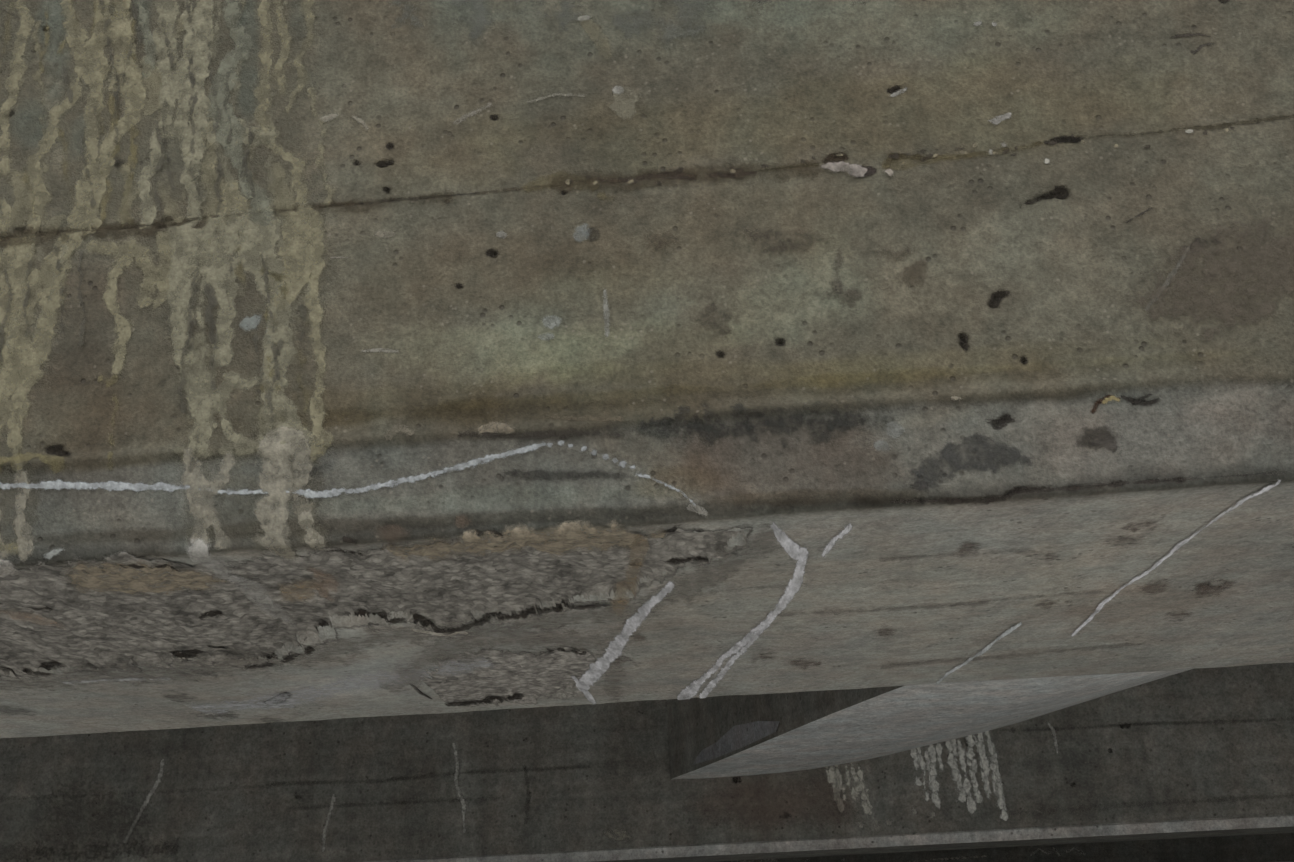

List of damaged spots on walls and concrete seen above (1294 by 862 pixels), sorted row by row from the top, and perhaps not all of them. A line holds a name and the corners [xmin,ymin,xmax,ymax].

crack [883,115,1294,169]
crack [0,164,819,241]
damp [0,0,333,560]
damp [912,435,1030,490]
spalling [0,504,752,684]
spalling [418,646,596,707]
efflorescence [825,762,892,828]
efflorescence [910,731,1008,821]